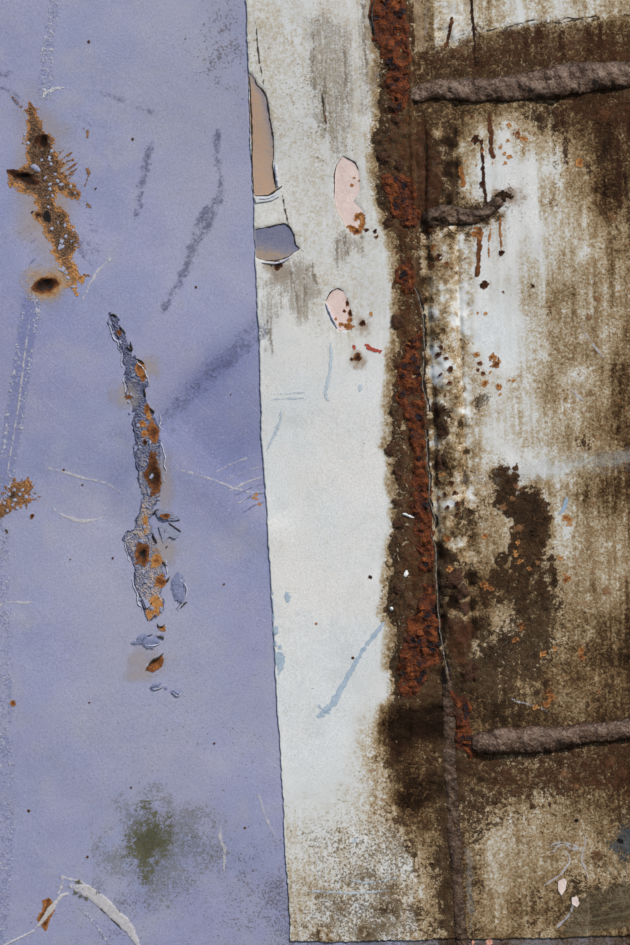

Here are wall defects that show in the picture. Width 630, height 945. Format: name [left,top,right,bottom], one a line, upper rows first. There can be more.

corrosion [2,87,99,301]
peeling [248,21,300,265]
peeling [334,156,366,235]
corrosion [381,123,444,235]
corrosion [458,114,528,205]
corrosion [470,217,505,289]
peeling [325,288,355,330]
corrosion [0,499,12,518]
peeling [107,312,181,631]
corrosion [393,327,475,699]
peeling [146,653,164,672]
spalling [5,876,86,945]